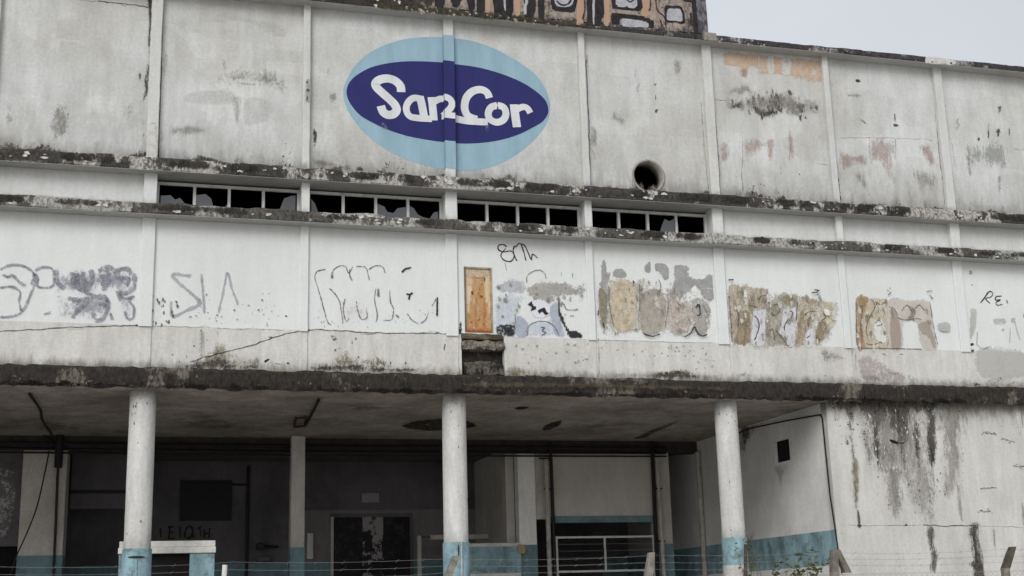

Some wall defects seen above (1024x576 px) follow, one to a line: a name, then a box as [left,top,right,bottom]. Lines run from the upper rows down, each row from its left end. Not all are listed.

leakage [729,85,818,120]
crack [190,328,446,362]
peeling [601,260,714,350]
peeling [733,288,829,345]
peeling [857,298,894,351]
leakage [655,369,700,379]
leakage [828,401,984,576]